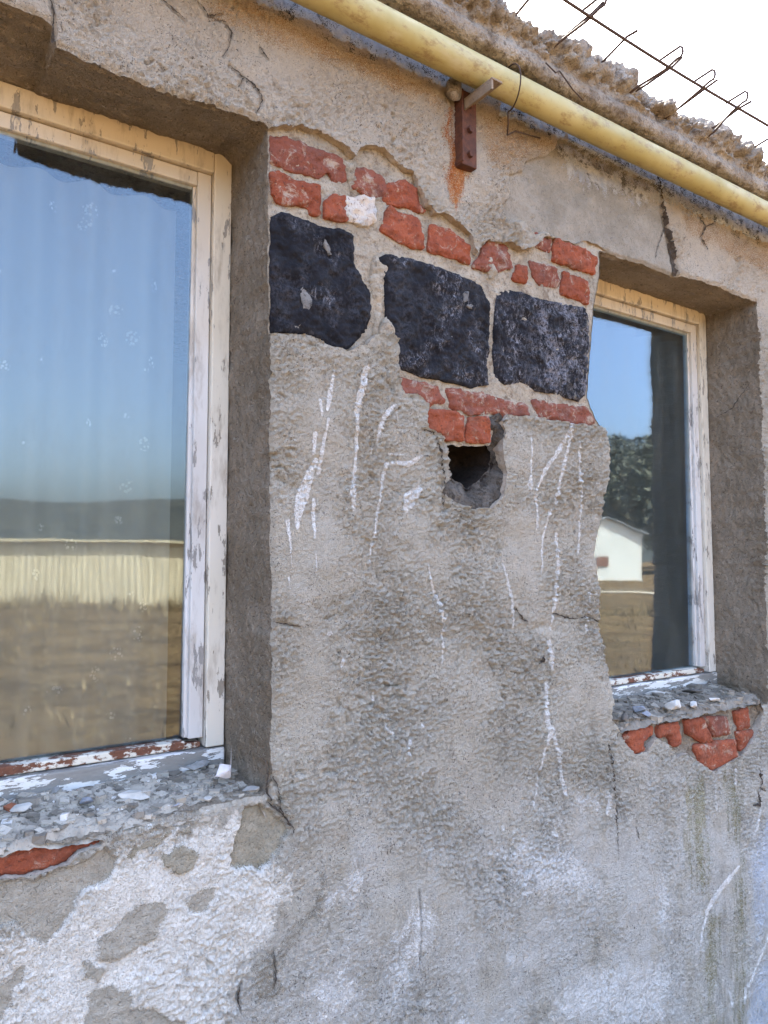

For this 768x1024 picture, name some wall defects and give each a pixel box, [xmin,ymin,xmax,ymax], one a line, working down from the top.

crack [163,0,263,112]
rust [441,107,471,215]
crack [656,176,678,276]
flaking render [262,101,768,509]
flaking render [613,706,759,771]
flaking render [230,803,289,871]
crack [259,754,295,835]